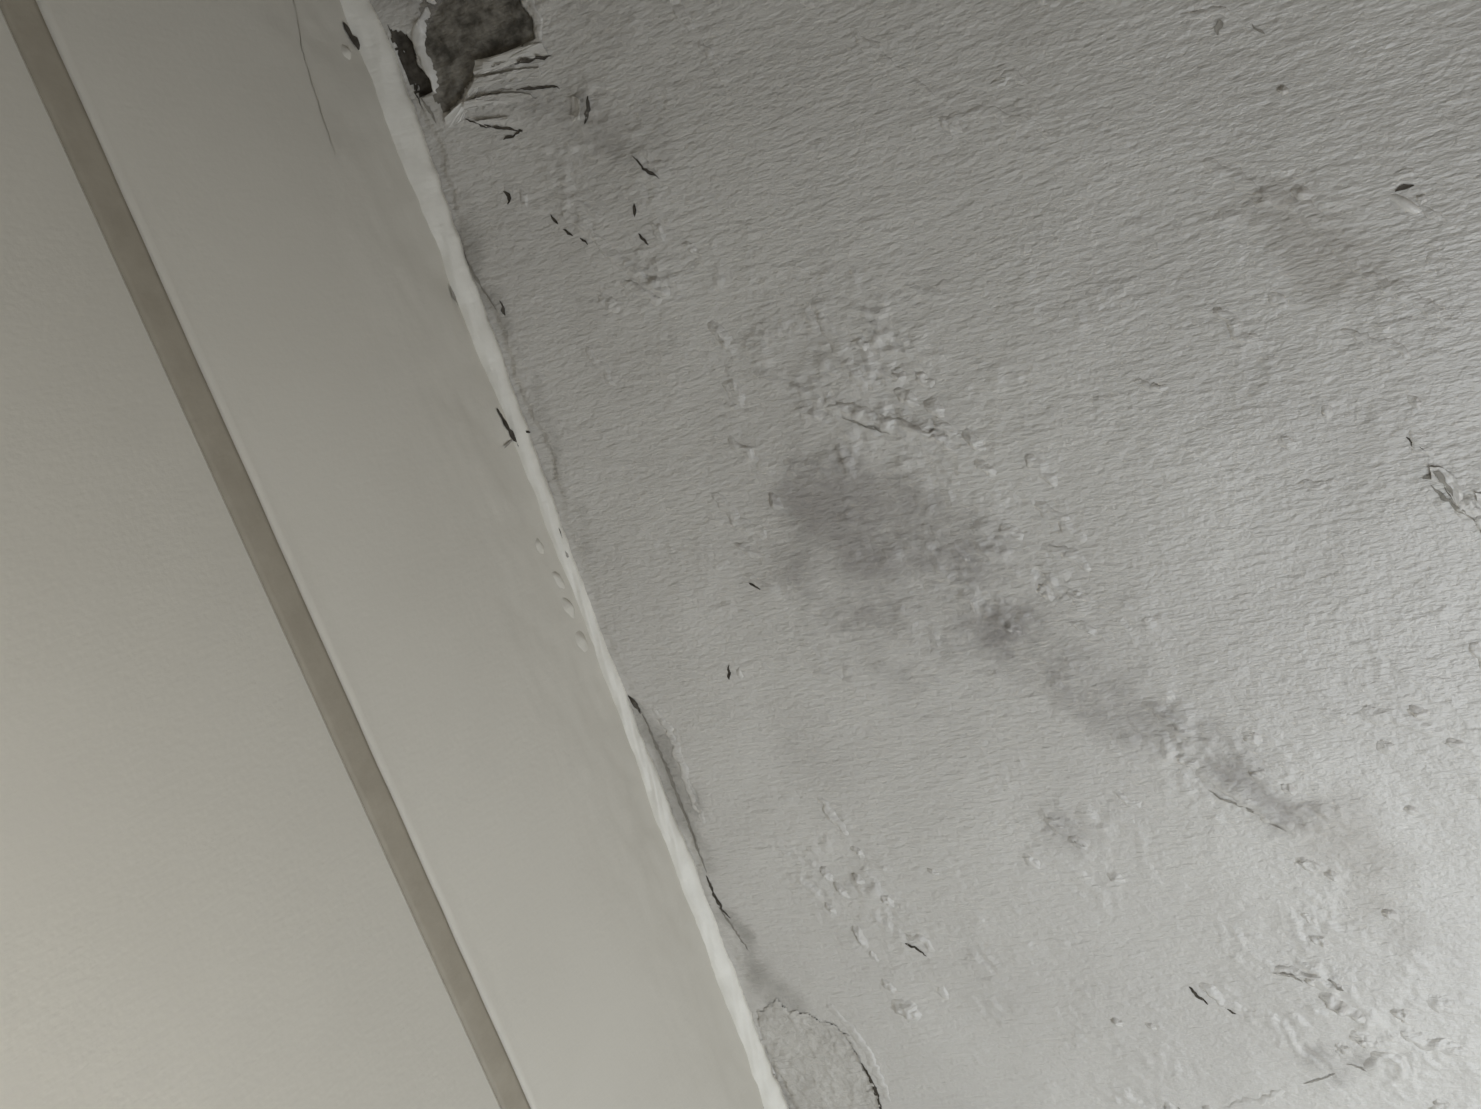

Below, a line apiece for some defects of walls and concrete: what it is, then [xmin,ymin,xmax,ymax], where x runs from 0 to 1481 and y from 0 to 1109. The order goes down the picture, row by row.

flaking render [388,0,591,140]
peeling [756,998,891,1109]